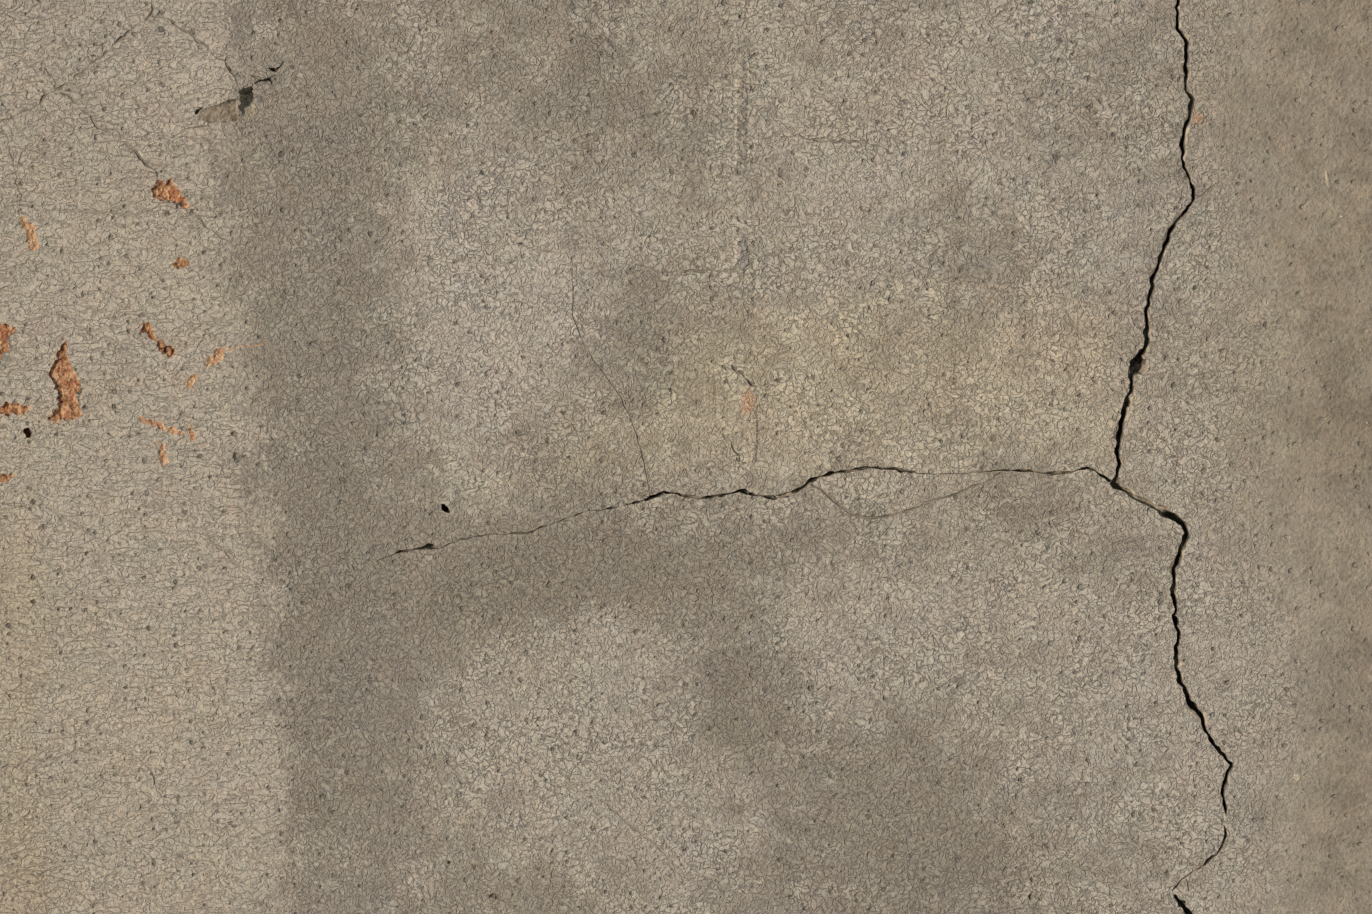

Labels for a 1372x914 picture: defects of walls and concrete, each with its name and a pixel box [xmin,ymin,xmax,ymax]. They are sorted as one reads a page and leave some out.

peeling [145,171,198,218]
peeling [18,214,39,252]
peeling [172,257,190,269]
peeling [140,322,176,359]
peeling [0,315,91,430]
peeling [183,346,227,389]
peeling [137,415,196,466]
crack [376,0,1237,914]